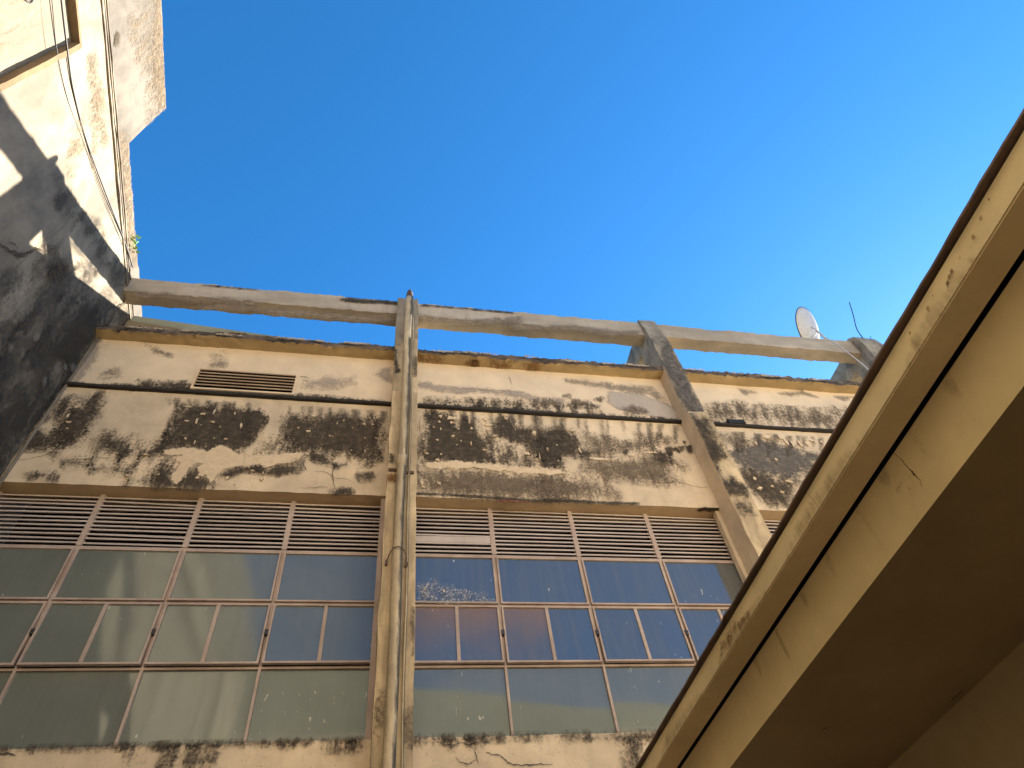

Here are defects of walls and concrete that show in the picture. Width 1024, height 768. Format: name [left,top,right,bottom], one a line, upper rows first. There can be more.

leakage [0,56,398,495]
leakage [417,340,846,512]
leakage [0,691,384,768]
leakage [404,706,546,749]
crack [441,742,551,766]
leakage [561,729,655,768]